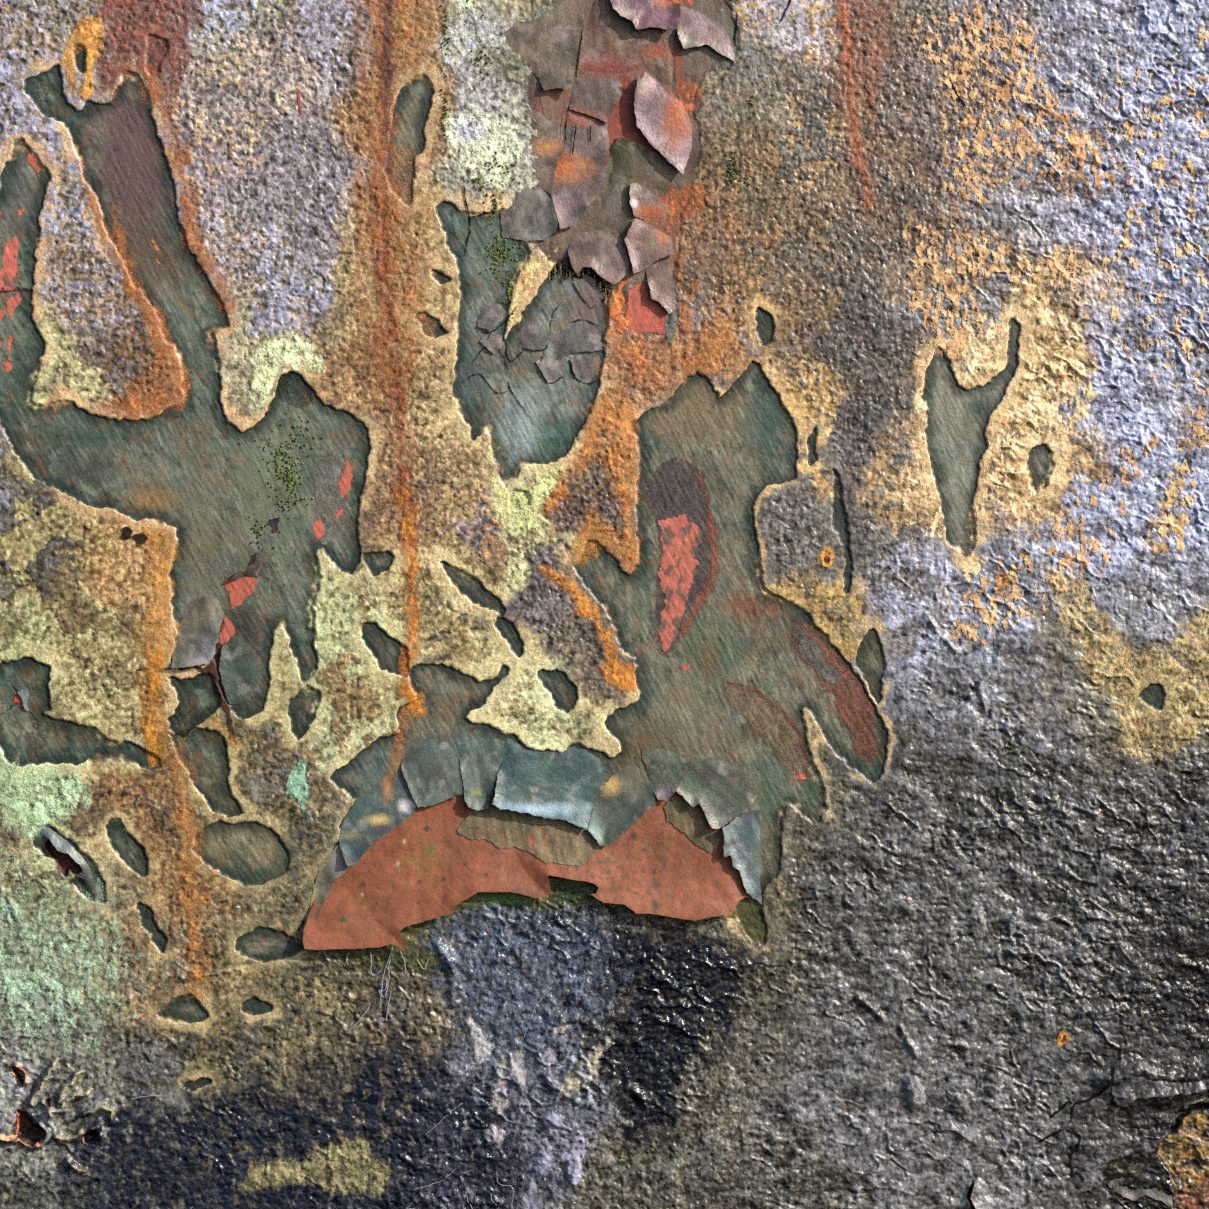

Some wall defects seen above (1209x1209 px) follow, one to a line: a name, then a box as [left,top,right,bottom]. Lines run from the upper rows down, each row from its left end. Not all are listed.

rust [62,0,236,314]
peeling [0,65,394,886]
rust [353,0,431,751]
peeling [235,361,889,977]
peeling [415,0,743,480]
rust [540,567,636,690]
rust [544,252,737,571]
peeling [922,318,1021,557]
water stain [0,903,764,1209]
crack [967,1180,975,1209]
crack [1038,1058,1119,1182]
spalling [1104,1059,1209,1209]